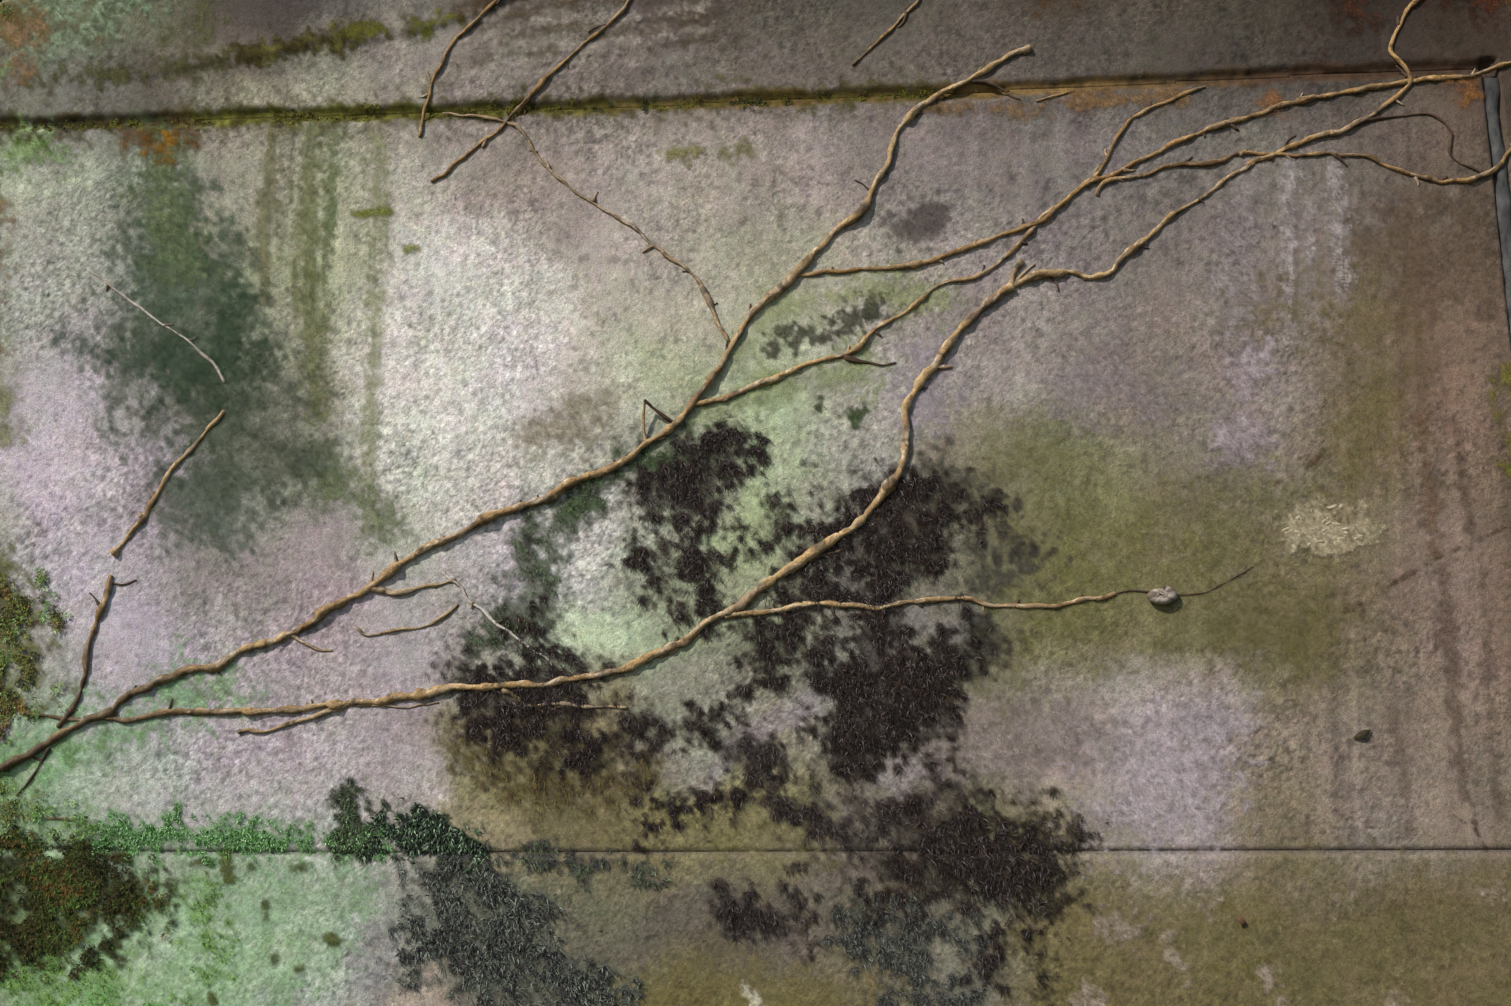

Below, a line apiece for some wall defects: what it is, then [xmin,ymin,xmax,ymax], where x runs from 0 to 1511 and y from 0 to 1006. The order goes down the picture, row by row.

damp [119,115,223,285]
damp [256,120,340,423]
damp [293,439,407,540]
damp [325,334,1262,1006]
damp [1258,967,1283,1006]